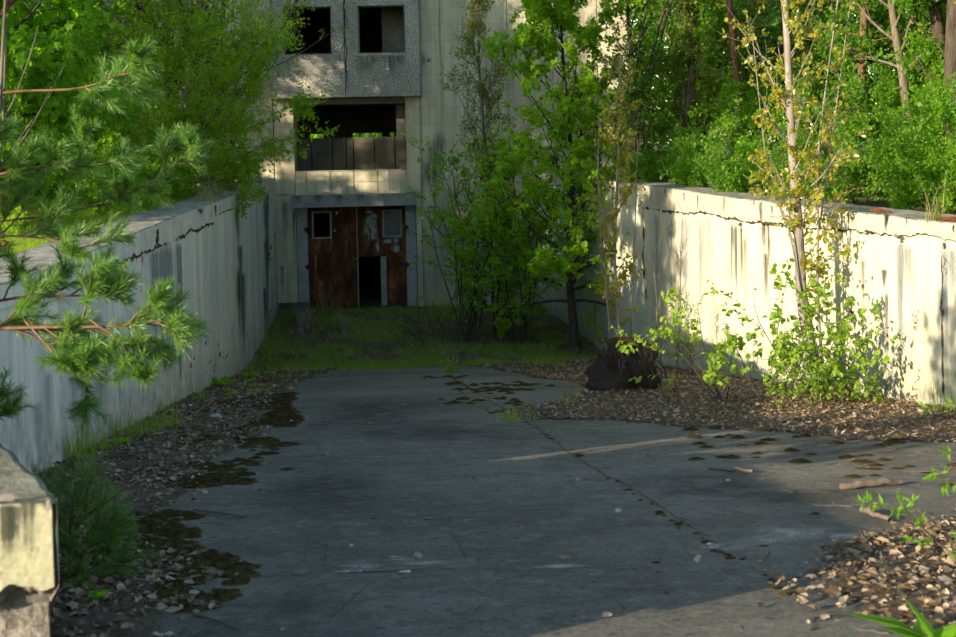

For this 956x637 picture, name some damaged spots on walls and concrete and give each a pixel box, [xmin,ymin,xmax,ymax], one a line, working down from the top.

crack [19,276,88,303]
crack [115,193,263,282]
damp [233,197,255,349]
damp [260,180,283,326]
peeling [364,210,400,253]
damp [731,225,746,271]
crack [642,198,956,393]
damp [882,245,911,358]
damp [942,251,956,361]
damp [0,498,48,549]
spalling [0,497,61,603]
crack [455,378,770,563]